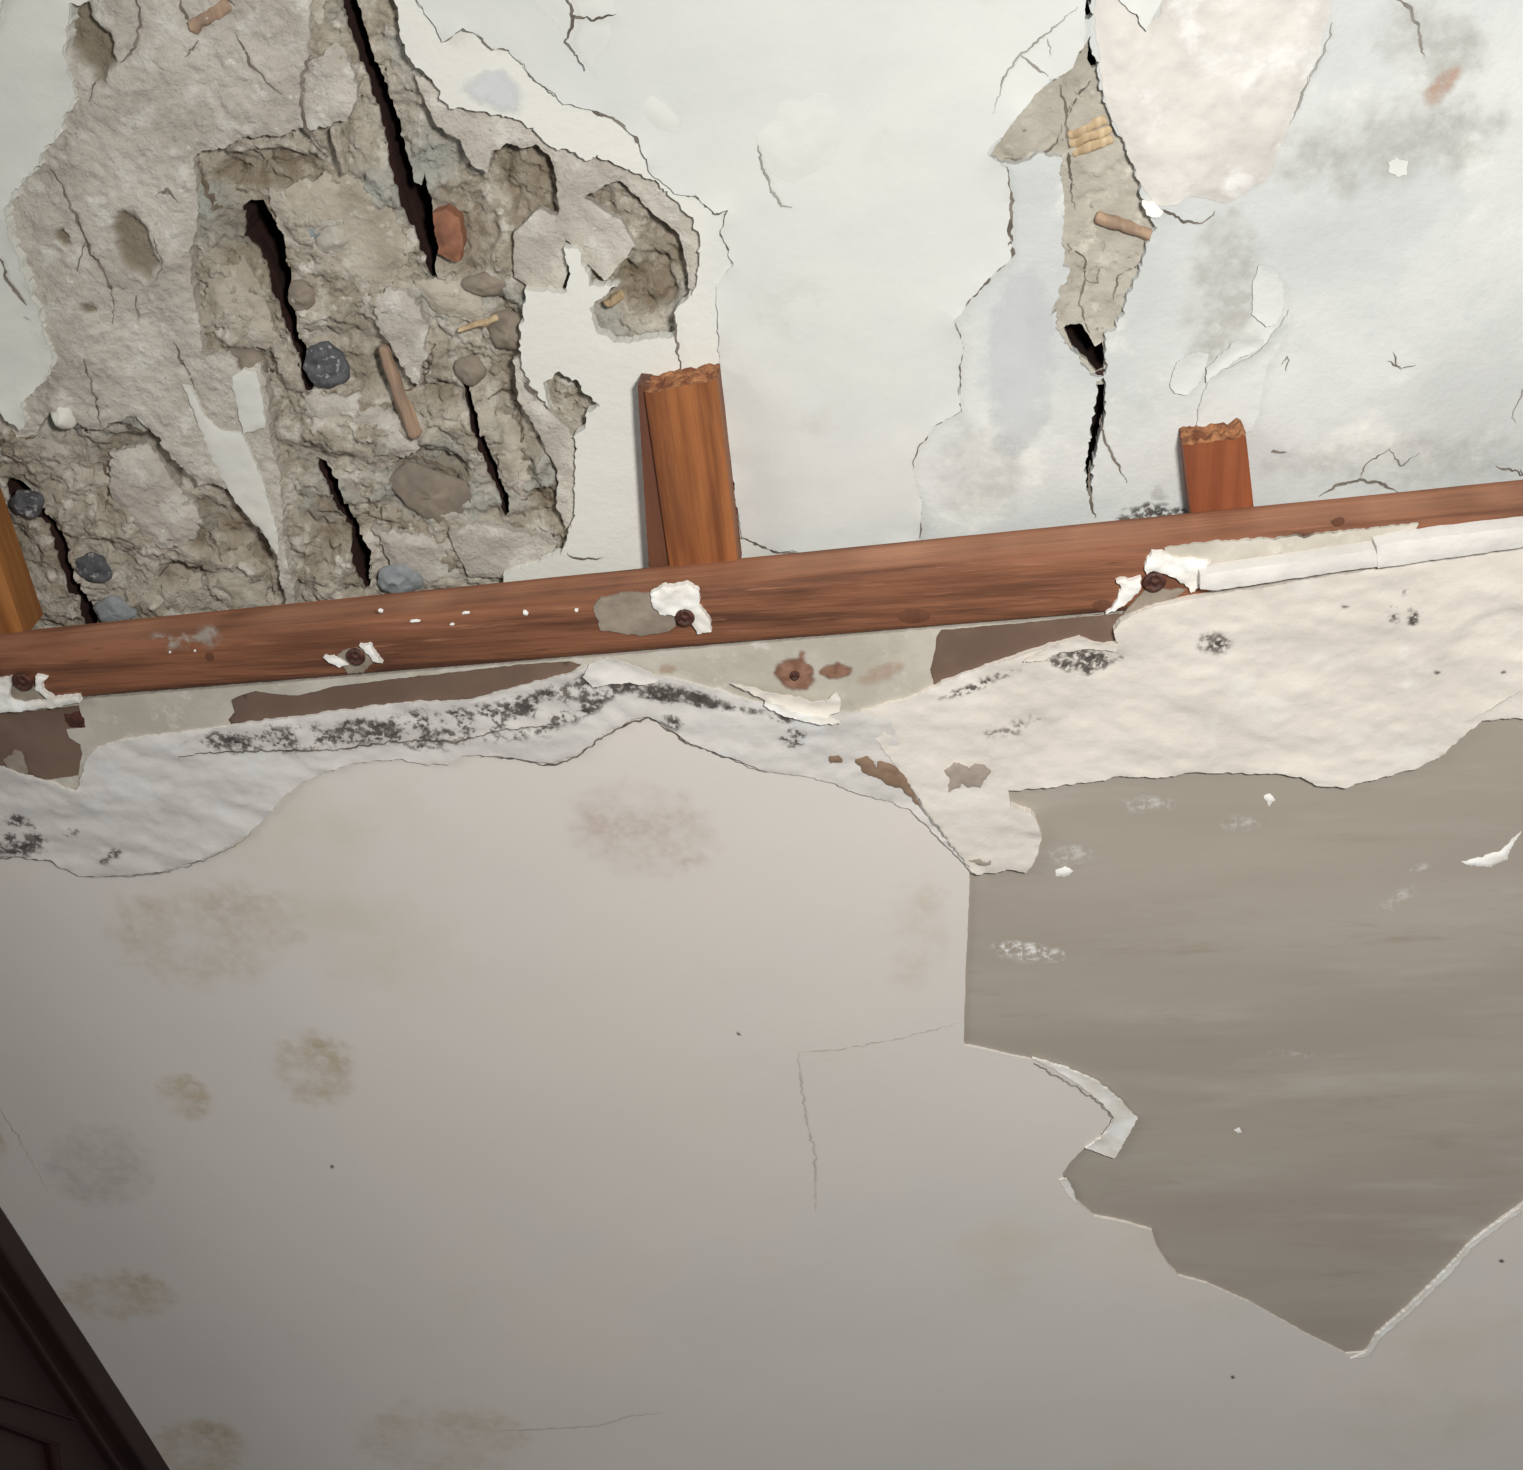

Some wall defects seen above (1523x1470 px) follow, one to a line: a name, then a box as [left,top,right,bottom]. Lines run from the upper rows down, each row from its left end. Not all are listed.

crack [243,199,314,390]
spalling [0,0,574,630]
peeling [417,0,1331,552]
crack [464,384,509,516]
crack [1085,369,1127,517]
crack [317,457,372,587]
water stain [0,814,43,857]
water stain [202,674,757,754]
rust [774,652,851,690]
peeling [944,762,991,793]
water stain [1051,649,1113,674]
peeling [964,718,1523,1359]